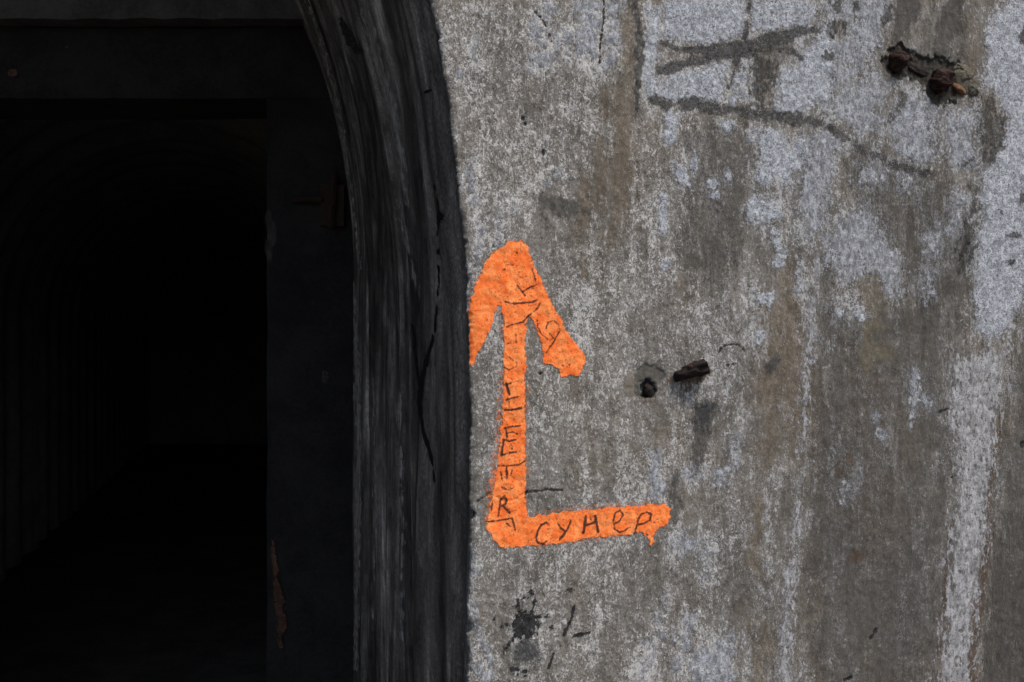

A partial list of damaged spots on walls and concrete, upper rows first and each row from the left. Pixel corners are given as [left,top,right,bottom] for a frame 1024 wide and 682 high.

crack [411,184,444,482]
damp [669,471,682,524]
damp [774,252,826,682]
damp [954,182,983,277]
damp [933,341,1015,682]
damp [958,95,1008,168]